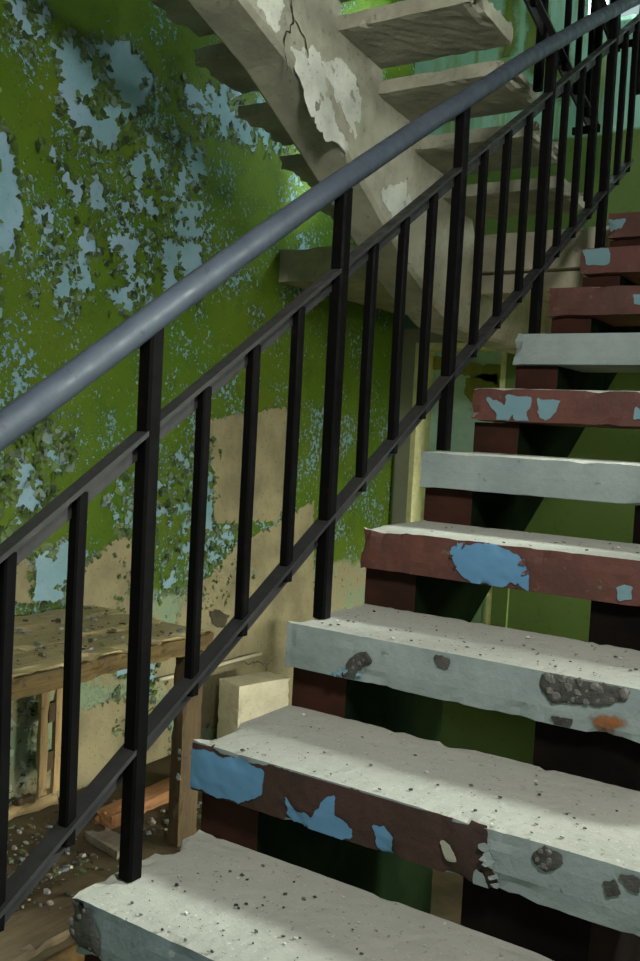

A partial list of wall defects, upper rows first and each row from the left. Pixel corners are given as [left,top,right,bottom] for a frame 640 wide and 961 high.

peeling [0,0,297,337]
crack [283,0,309,70]
flaking render [290,45,362,156]
peeling [15,536,69,610]
flaking render [77,669,127,790]
flaking render [83,473,134,613]
flaking render [201,412,244,640]
flaking render [201,551,315,729]
flaking render [249,406,287,598]
peeling [449,543,529,591]
spalling [540,672,630,707]
peeling [146,723,499,889]